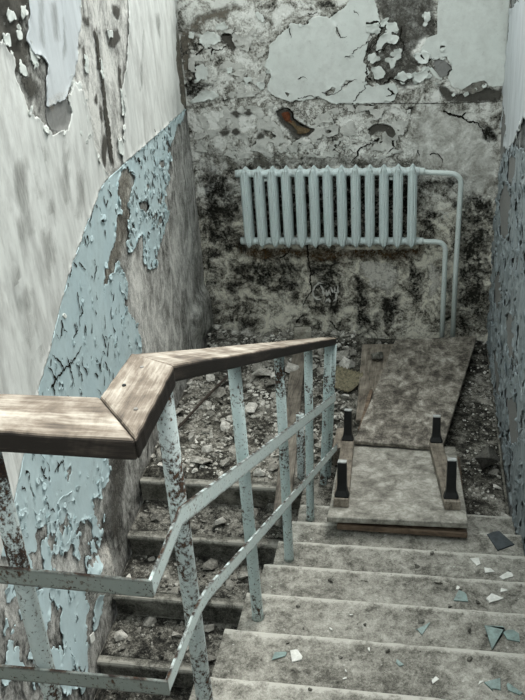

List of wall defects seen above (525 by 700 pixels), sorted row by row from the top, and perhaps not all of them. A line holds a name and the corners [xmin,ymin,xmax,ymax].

crack [298,79,503,135]
damp [483,126,496,142]
damp [198,149,243,253]
damp [385,180,393,247]
crack [48,262,97,394]
peeling [0,0,525,557]
damp [349,261,400,339]
damp [408,195,493,332]
peeling [5,584,16,603]
peeling [3,609,34,666]
peeling [35,587,105,672]
peeling [60,685,86,696]